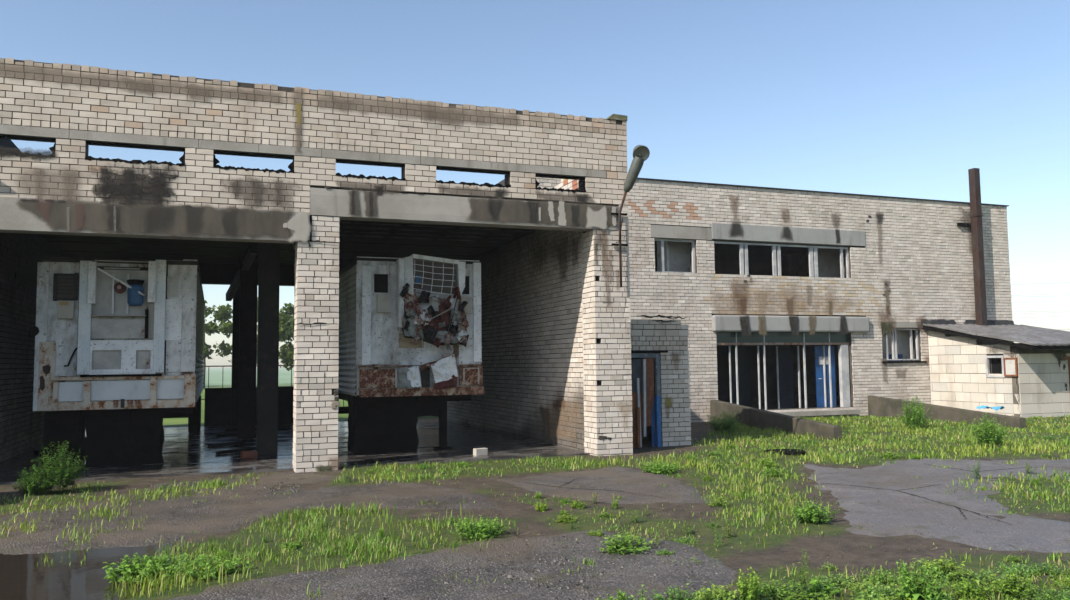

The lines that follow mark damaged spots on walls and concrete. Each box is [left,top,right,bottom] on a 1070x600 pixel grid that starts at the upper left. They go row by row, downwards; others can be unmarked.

leakage [17,167,292,238]
leakage [349,185,383,216]
leakage [469,189,617,227]
leakage [740,315,767,336]
leakage [789,315,816,335]
leakage [840,315,849,334]